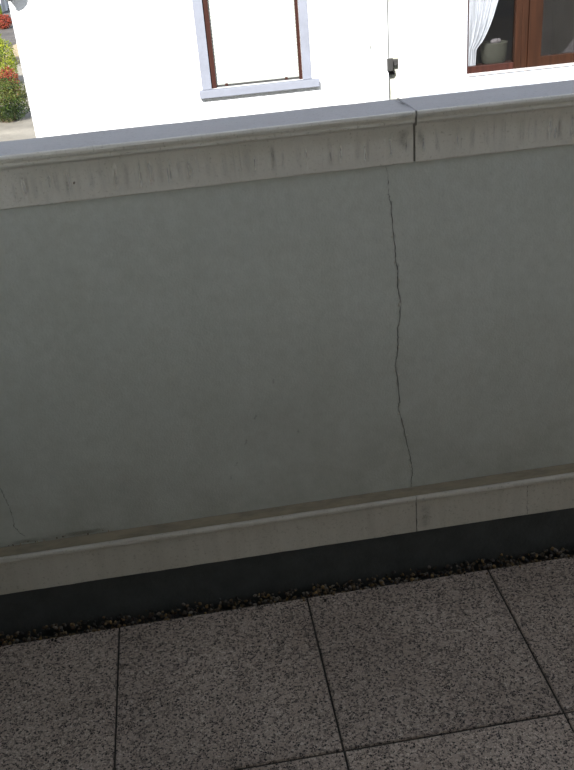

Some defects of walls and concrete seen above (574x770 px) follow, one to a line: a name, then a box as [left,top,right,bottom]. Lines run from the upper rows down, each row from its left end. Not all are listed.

crack [388,181,413,475]